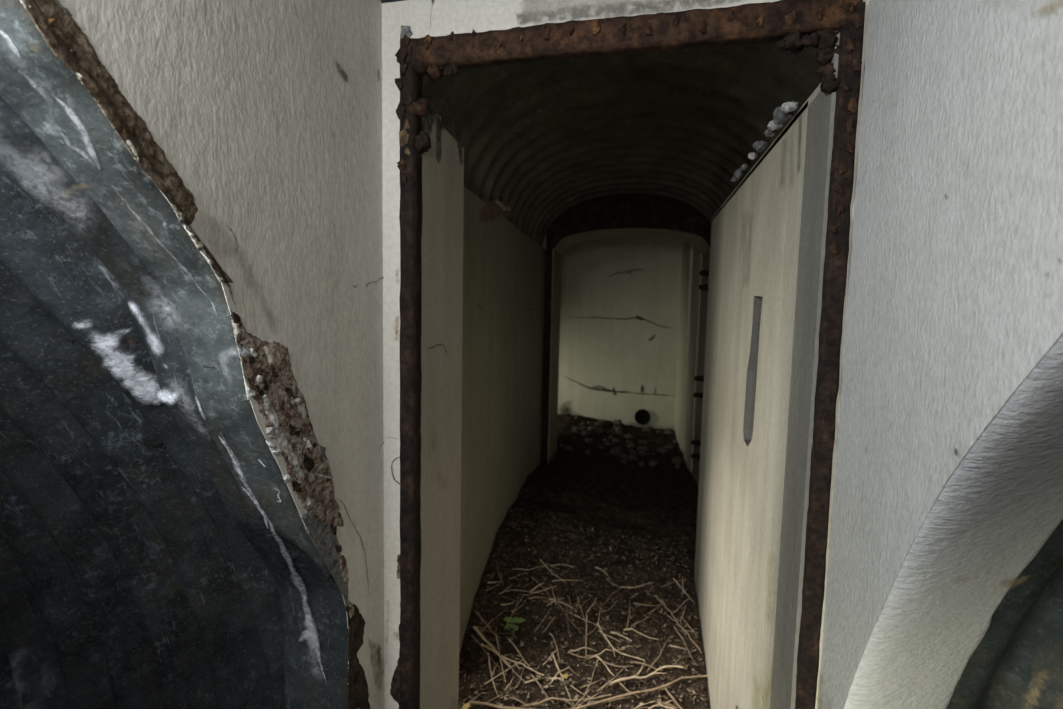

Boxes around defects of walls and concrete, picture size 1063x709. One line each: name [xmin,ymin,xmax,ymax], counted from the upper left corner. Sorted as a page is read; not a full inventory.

leakage [522,0,719,21]
rust [845,14,863,73]
flaking render [21,0,233,285]
rust [395,33,413,187]
rust [845,98,857,154]
crack [576,316,674,340]
crack [568,378,670,396]
flaking render [230,311,370,709]